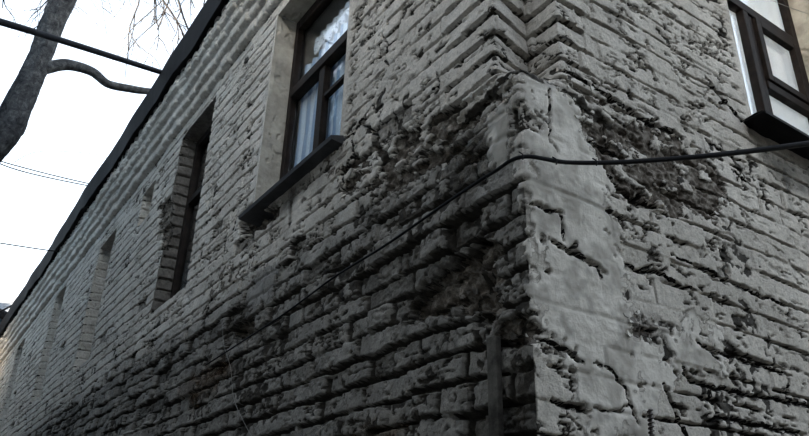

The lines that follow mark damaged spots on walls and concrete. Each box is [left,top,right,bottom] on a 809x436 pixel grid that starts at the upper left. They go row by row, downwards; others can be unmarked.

spalling [567,84,729,226]